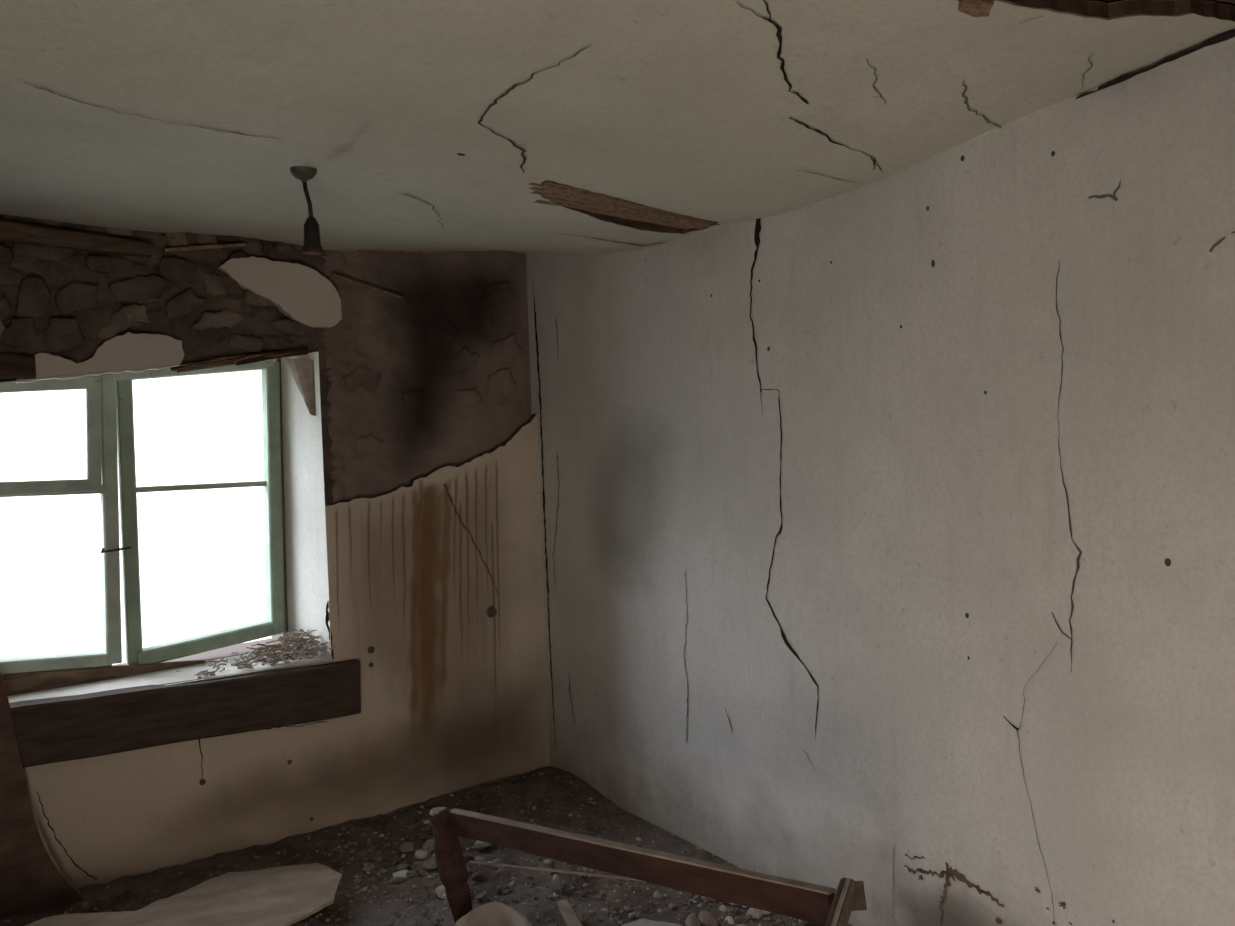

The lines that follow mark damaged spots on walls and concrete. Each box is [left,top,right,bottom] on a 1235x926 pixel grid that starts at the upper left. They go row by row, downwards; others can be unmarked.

crack [477,46,591,173]
crack [737,0,882,183]
peeling [958,0,994,17]
crack [1076,31,1235,99]
spalling [0,214,532,505]
crack [750,218,819,771]
crack [1051,265,1082,672]